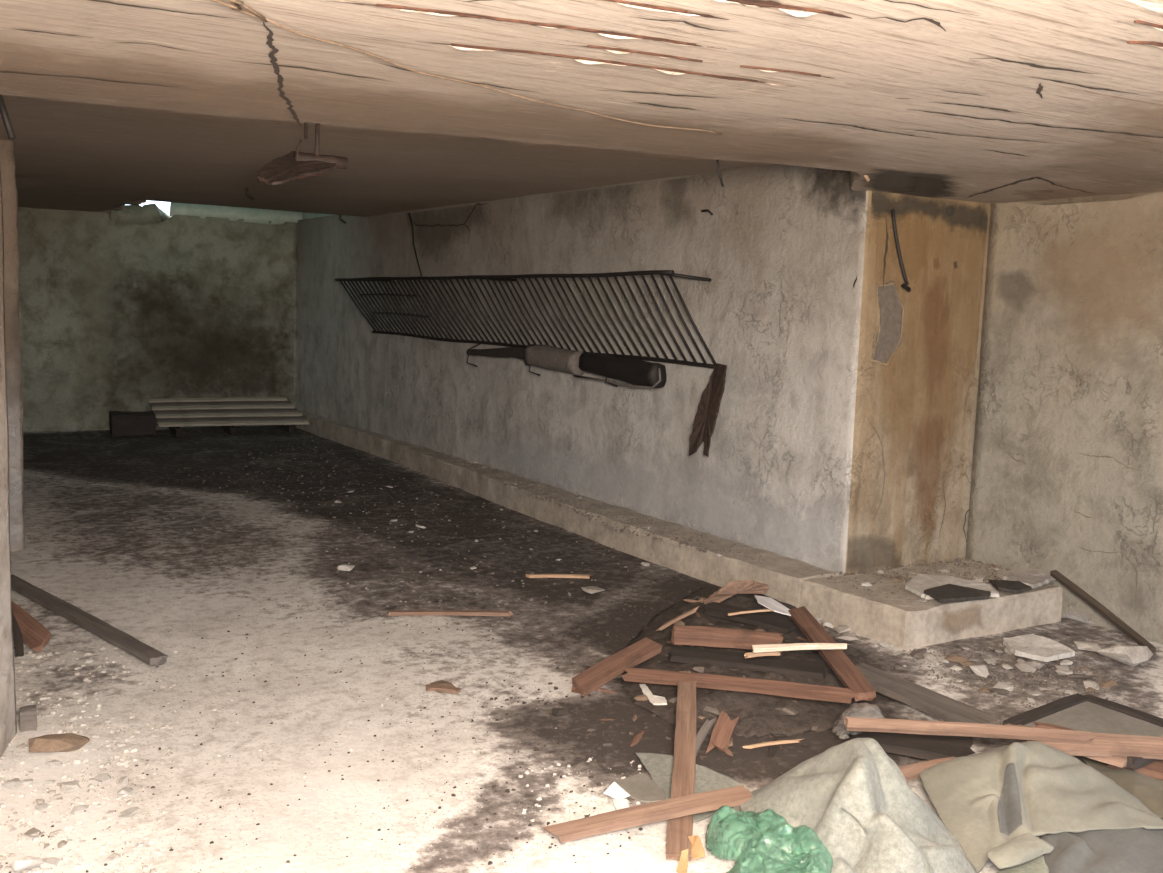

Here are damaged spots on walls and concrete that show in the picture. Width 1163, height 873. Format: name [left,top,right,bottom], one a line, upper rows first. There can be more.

crack [630,16,739,32]
crack [869,0,979,32]
crack [11,28,187,51]
crack [89,0,413,126]
crack [0,71,179,88]
crack [456,81,539,93]
flaking render [871,281,904,366]